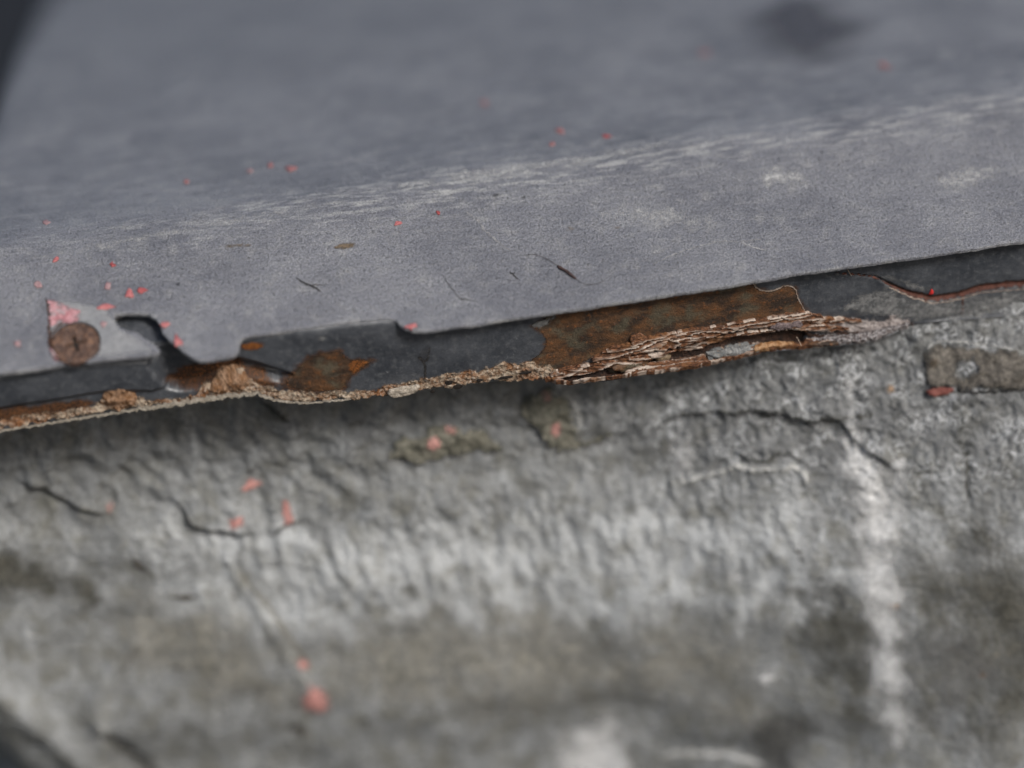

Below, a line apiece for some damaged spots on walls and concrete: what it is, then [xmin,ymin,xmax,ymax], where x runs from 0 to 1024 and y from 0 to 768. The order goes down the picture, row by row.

corrosion [0,283,862,433]
crack [662,409,937,475]